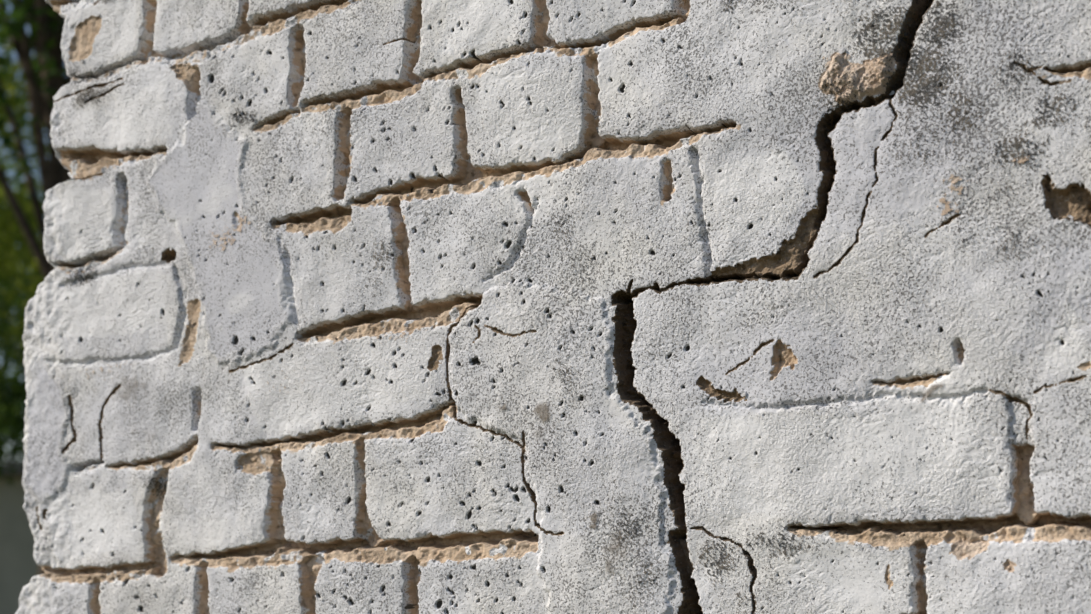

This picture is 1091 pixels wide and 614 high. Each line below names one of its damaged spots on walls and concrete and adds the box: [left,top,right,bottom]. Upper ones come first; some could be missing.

spalling [68,13,102,63]
spalling [818,47,895,107]
crack [924,214,961,238]
spalling [1039,170,1091,227]
crack [611,0,934,614]
spalling [770,340,798,381]
spalling [696,376,747,403]
crack [61,384,121,462]
crack [445,304,564,536]